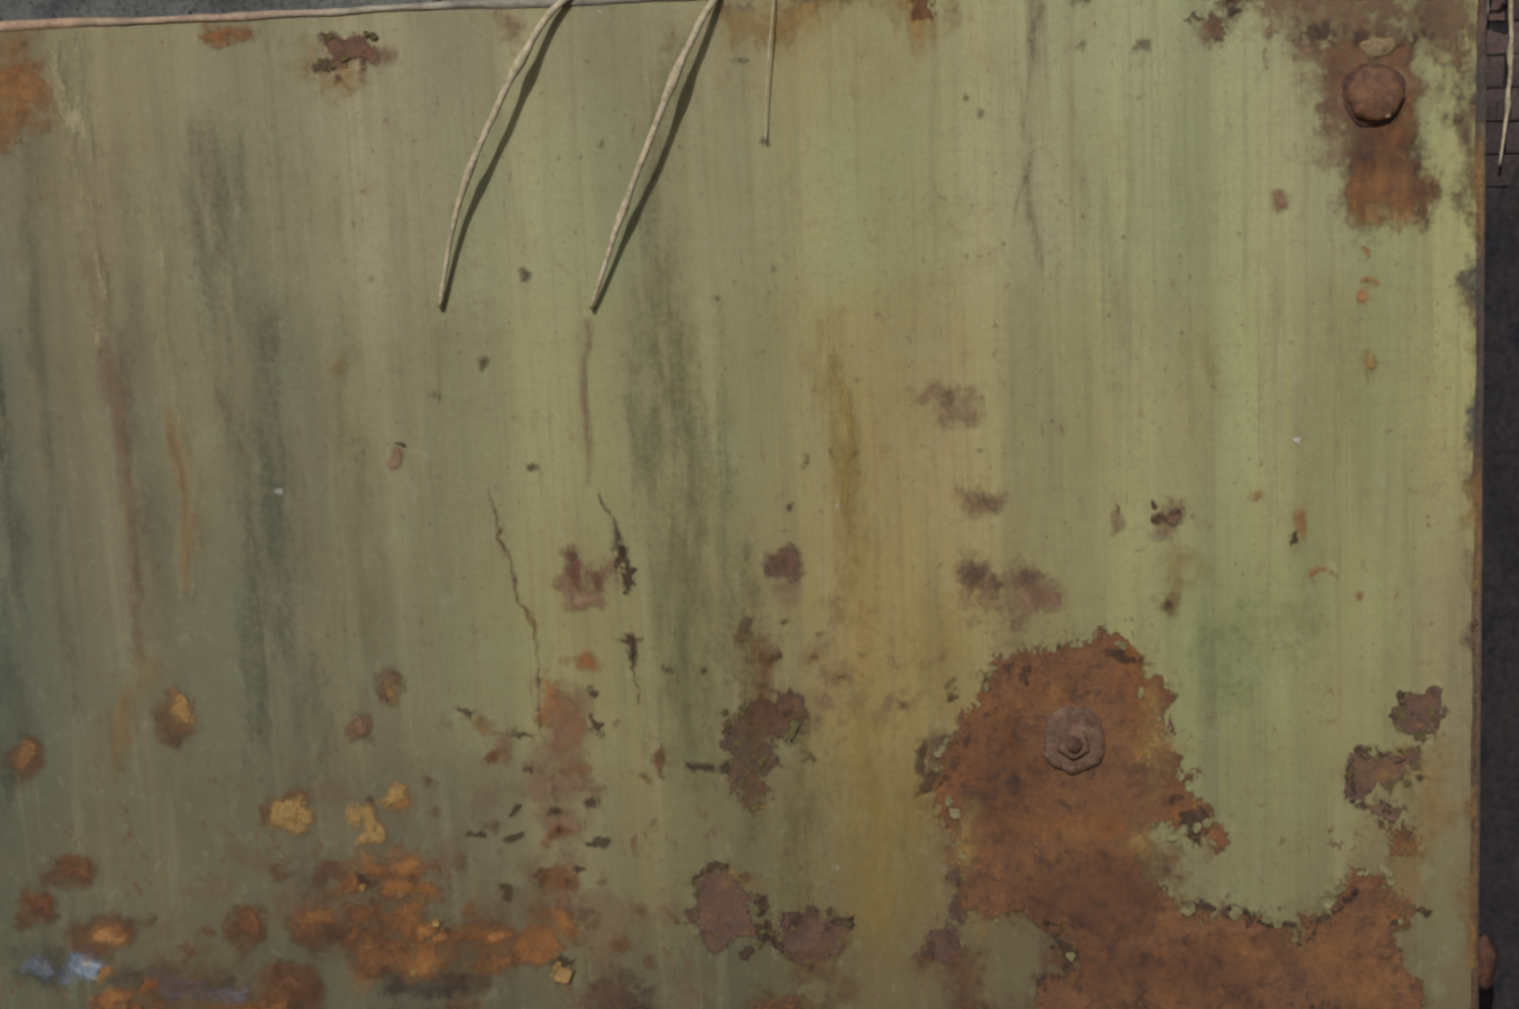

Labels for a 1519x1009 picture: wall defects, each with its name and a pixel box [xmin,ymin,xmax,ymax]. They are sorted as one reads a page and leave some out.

rust [1187,0,1249,41]
rust [1274,0,1482,237]
rust [259,791,314,834]
rust [465,653,610,848]
rust [686,685,827,811]
rust [914,625,1448,1009]
rust [65,916,152,957]
rust [89,976,163,1009]
rust [311,783,596,982]
rust [676,861,855,971]